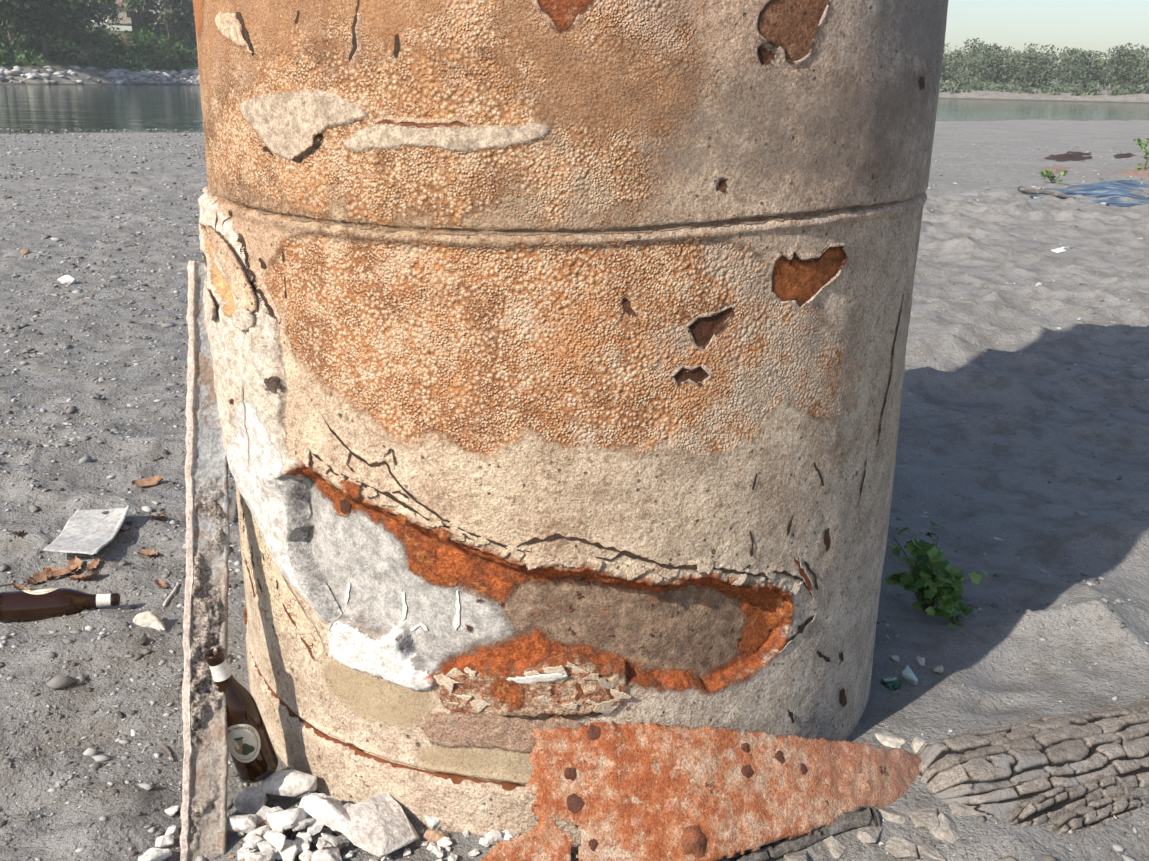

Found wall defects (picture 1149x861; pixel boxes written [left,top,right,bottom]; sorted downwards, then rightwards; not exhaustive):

crack [349,0,362,65]
crack [392,34,400,58]
peeling [240,89,550,162]
rust [193,0,857,458]
peeling [276,446,632,753]
rust [286,463,794,694]
crack [305,409,831,662]
peeling [627,566,679,581]
peeling [696,559,714,574]
peeling [729,573,748,586]